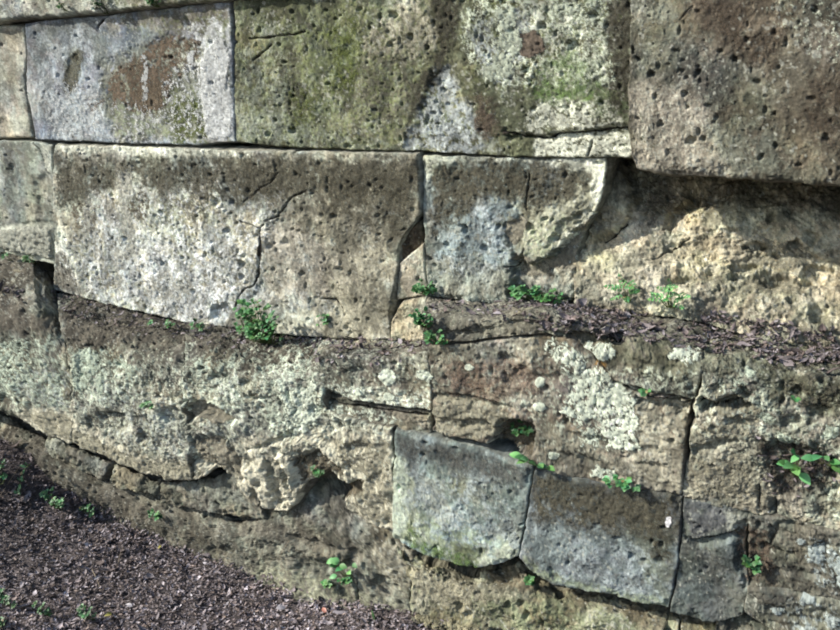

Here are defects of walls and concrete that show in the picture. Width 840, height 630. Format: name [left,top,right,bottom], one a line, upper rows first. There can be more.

crack [235,172,303,307]